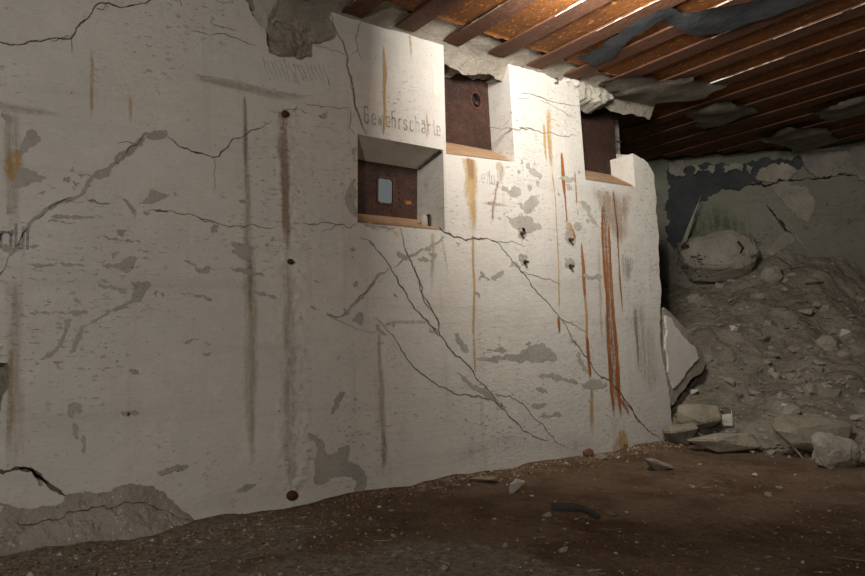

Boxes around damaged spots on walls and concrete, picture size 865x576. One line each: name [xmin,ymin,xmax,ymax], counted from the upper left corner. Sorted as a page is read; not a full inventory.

crack [0,0,151,46]
crack [190,23,254,45]
spalling [251,0,337,60]
crack [0,122,274,274]
rust [280,117,290,234]
rust [543,115,632,413]
crack [296,222,660,447]
spalling [0,363,12,411]
crack [0,466,66,496]
spalling [308,433,367,492]
spalling [0,483,194,556]